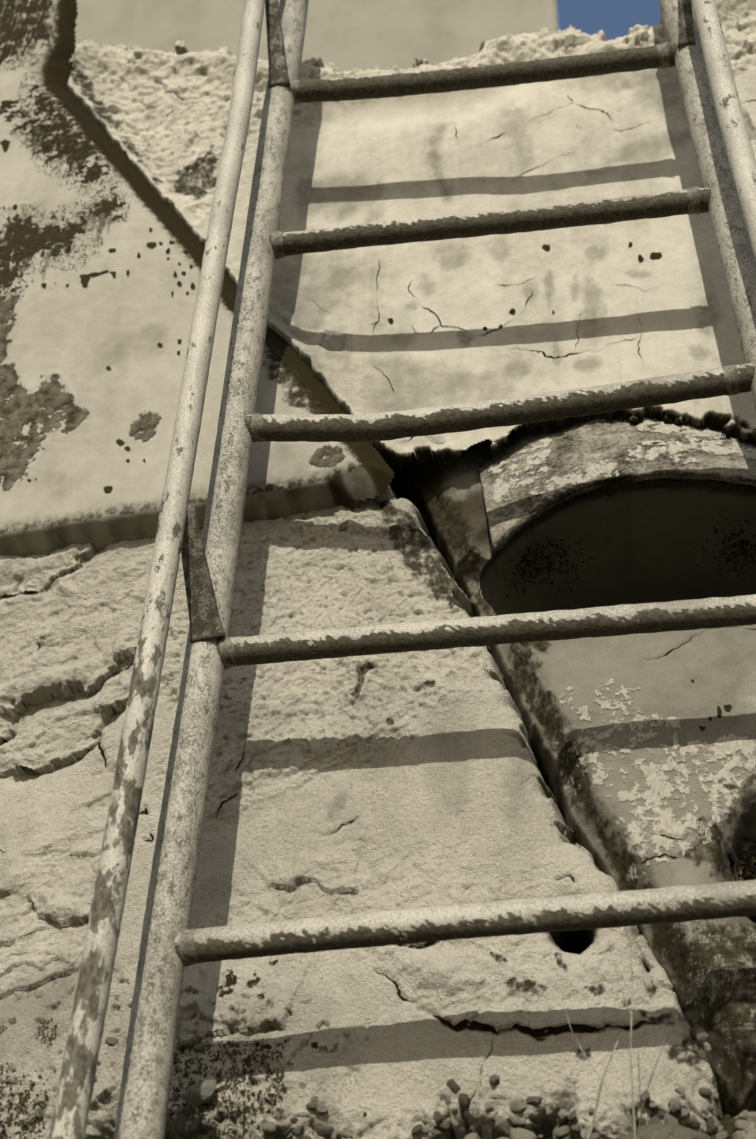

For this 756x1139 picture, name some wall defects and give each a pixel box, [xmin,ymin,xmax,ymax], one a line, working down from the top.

crack [476,93,641,181]
crack [367,253,382,337]
crack [408,278,648,359]
peeling [0,543,97,594]
peeling [0,616,142,777]
peeling [550,679,756,889]
crack [396,940,437,948]
crack [377,972,660,1120]
spalling [242,1114,283,1139]